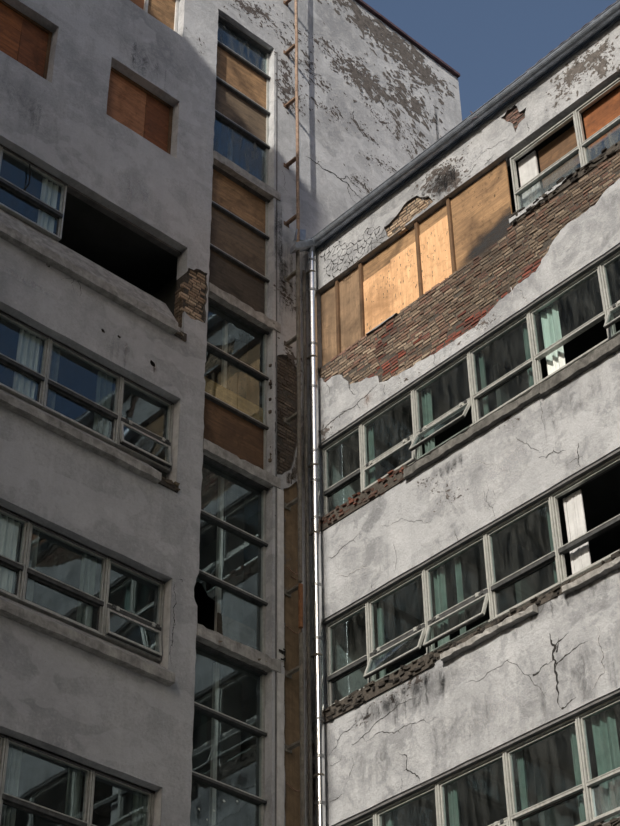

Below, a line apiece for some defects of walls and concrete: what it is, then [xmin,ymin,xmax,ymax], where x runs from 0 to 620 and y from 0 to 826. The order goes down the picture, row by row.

peeling [224,0,456,173]
flaking render [502,107,525,129]
peeling [546,24,620,117]
flaking render [174,270,206,328]
crack [320,226,386,280]
flaking render [319,142,620,384]
flaking render [268,337,308,475]
crack [466,629,609,710]
crack [329,698,435,801]